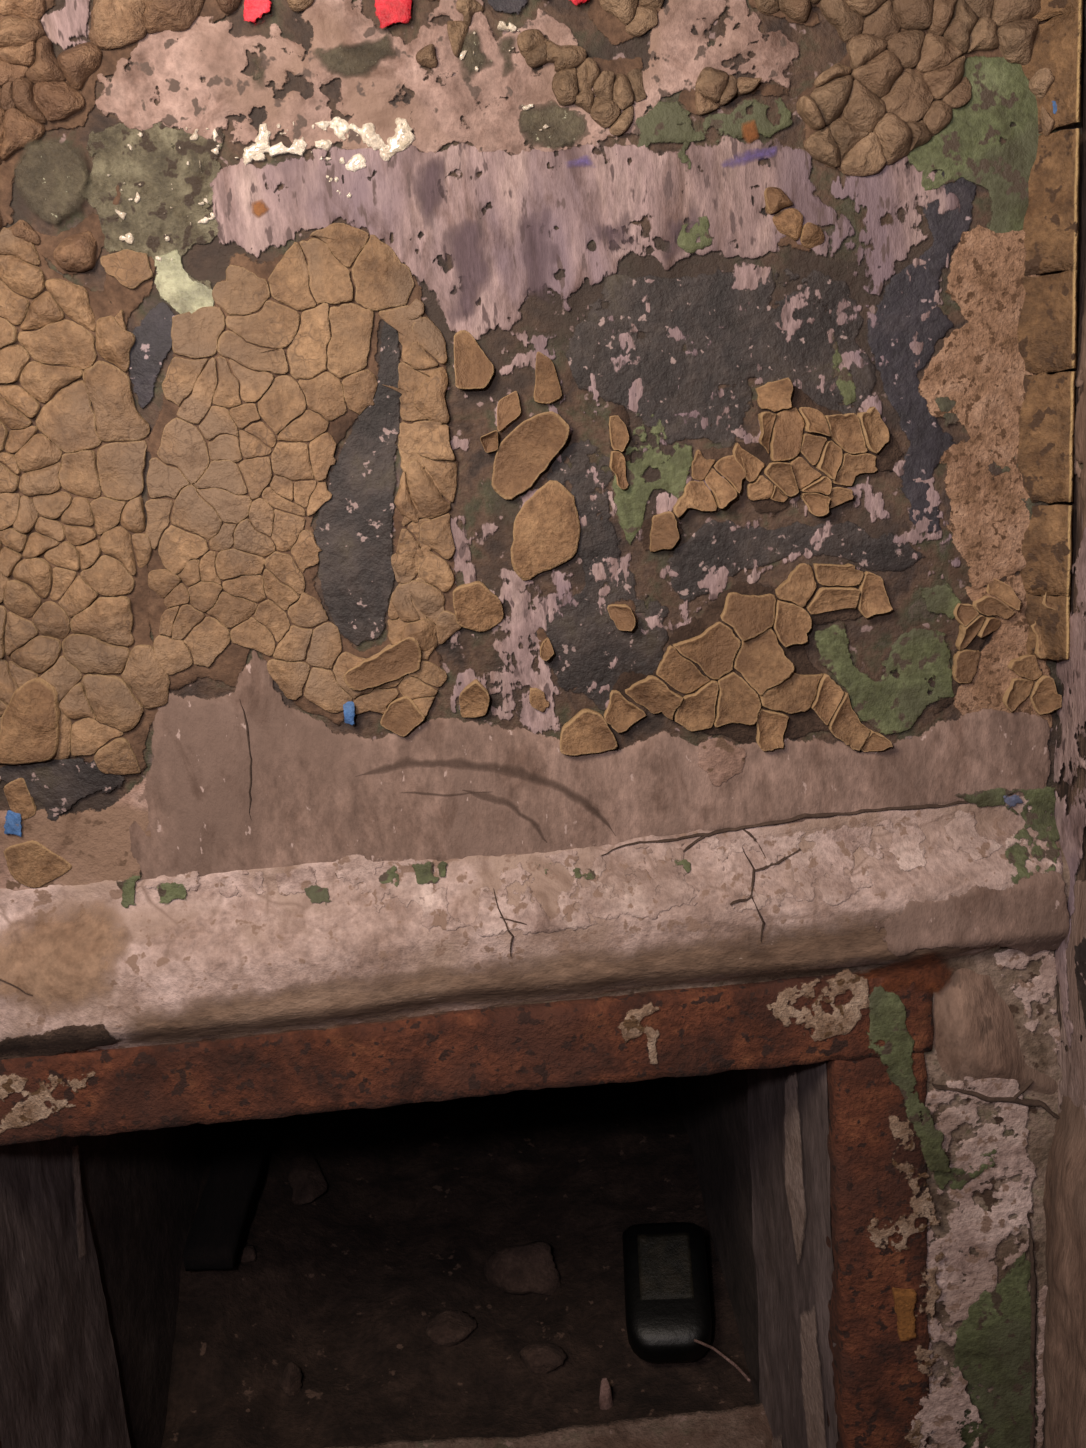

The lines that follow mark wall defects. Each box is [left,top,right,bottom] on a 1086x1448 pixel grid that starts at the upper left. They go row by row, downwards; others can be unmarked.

crack [602,801,968,939]
corrosion [856,954,951,992]
peeling [766,969,1048,1448]